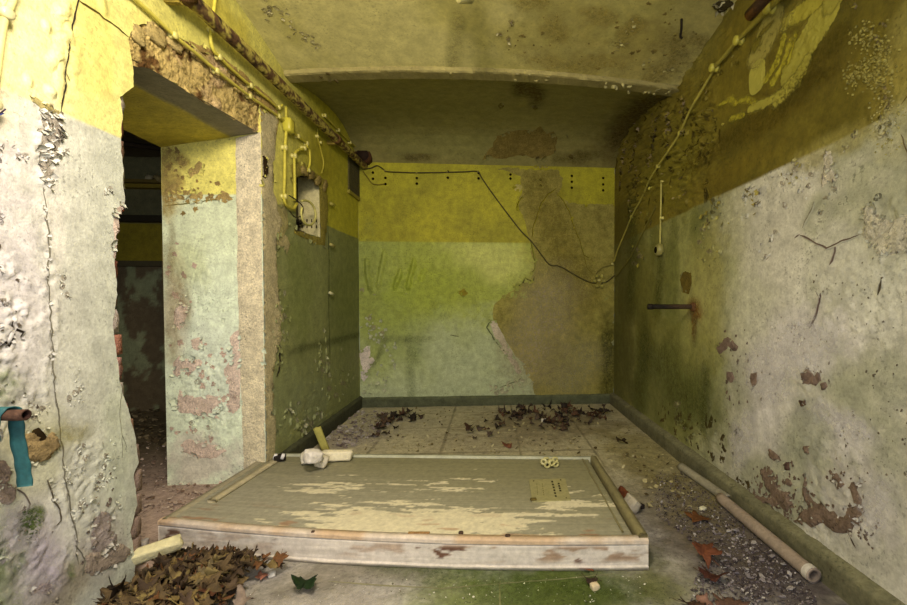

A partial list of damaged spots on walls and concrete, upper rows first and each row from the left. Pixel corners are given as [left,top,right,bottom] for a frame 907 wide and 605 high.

crack [61,0,127,112]
peeling [0,95,70,191]
peeling [615,45,739,225]
peeling [165,41,328,469]
flaking render [483,126,615,396]
peeling [858,193,907,264]
crack [0,321,26,347]
flaking render [11,392,61,466]
crack [17,187,86,576]
peeling [658,329,771,464]
flaking render [736,411,880,549]
peeling [791,326,830,390]